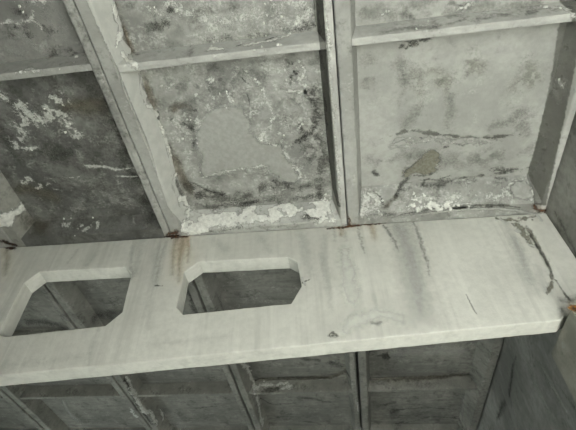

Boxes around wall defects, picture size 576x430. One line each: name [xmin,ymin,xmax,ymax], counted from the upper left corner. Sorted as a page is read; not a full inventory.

damp [115,30,139,70]
damp [0,85,142,186]
damp [145,0,341,235]
damp [0,202,47,233]
damp [360,189,392,220]
damp [401,179,505,213]
crack [526,228,570,300]